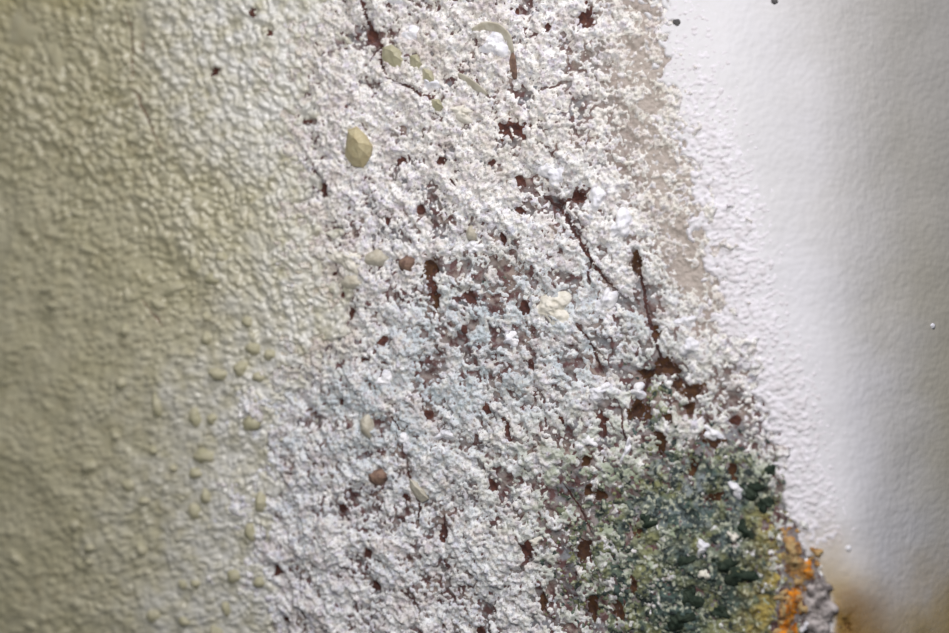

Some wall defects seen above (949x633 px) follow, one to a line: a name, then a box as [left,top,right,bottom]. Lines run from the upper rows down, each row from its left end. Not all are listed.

leakage [211,0,882,633]
spalling [258,0,851,633]
corrosion [773,526,824,633]